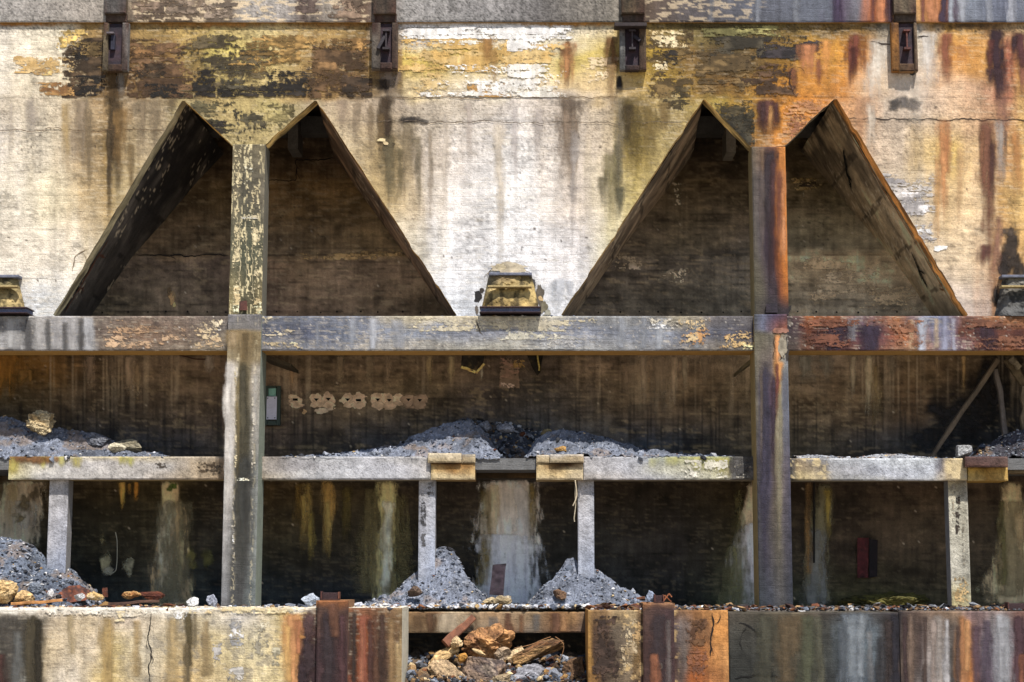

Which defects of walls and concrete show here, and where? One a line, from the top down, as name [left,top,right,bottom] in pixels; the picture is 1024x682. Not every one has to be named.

peeling [13,29,107,98]
peeling [398,25,574,97]
rust [845,34,861,79]
water stain [106,73,175,200]
peeling [127,32,373,348]
water stain [559,97,581,197]
rust [760,150,786,251]
crack [843,117,1024,309]
rust [979,121,1001,263]
peeling [103,319,224,349]
water stain [361,482,409,598]
crack [146,617,154,681]